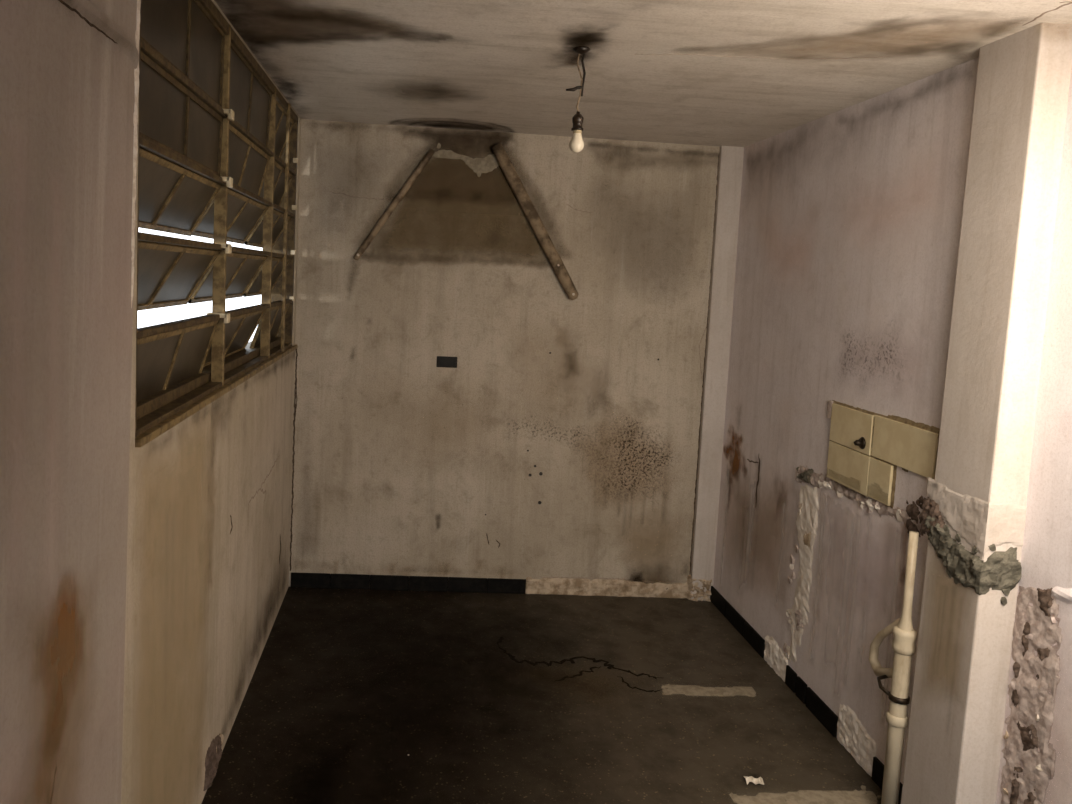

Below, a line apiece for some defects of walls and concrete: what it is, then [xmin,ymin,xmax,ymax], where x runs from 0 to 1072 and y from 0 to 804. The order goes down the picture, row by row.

damp [238,0,412,43]
damp [608,428,669,492]
rust [724,432,746,477]
flaking render [525,577,688,598]
peeling [764,466,1026,682]
rust [45,593,81,754]
crack [497,637,660,692]
flaking render [1000,586,1062,804]
flaking render [837,704,877,777]